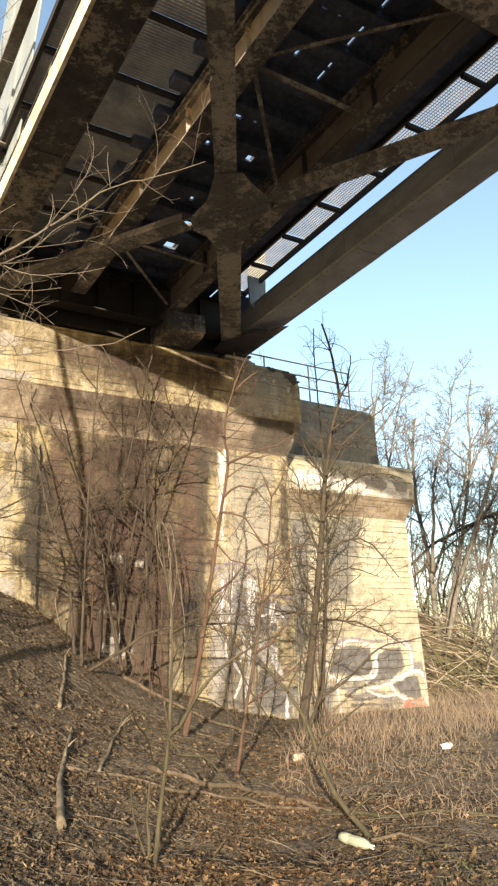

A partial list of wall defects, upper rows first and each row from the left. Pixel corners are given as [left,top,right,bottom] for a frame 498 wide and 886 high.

water stain [0,339,410,691]
spalling [363,477,408,492]